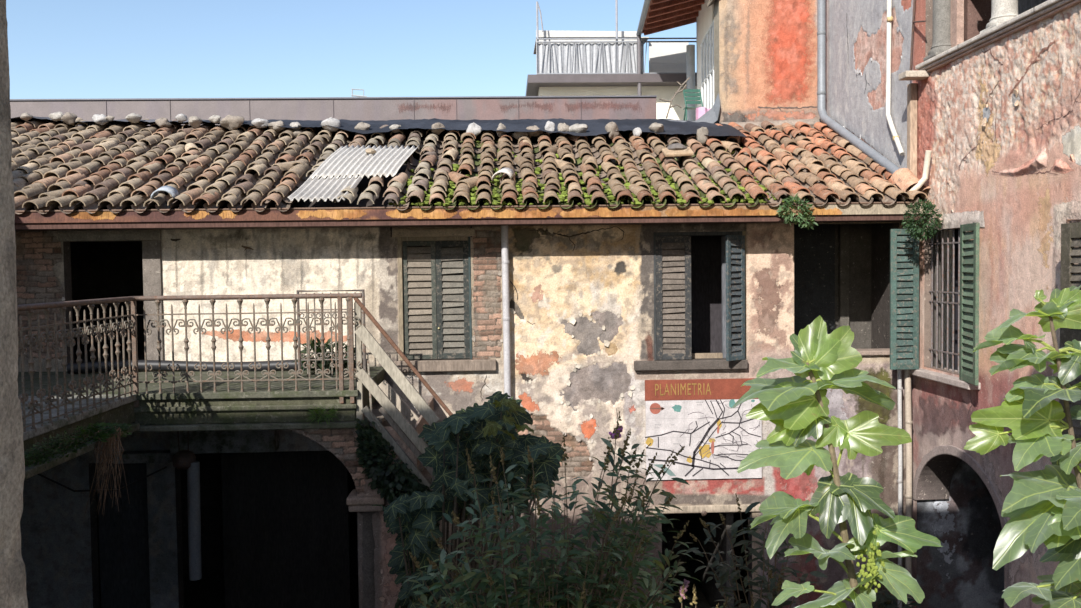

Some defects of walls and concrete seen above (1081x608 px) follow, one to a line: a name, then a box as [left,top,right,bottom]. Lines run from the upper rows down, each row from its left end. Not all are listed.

flaking render [853,0,912,110]
crack [959,41,1057,175]
crack [1036,90,1081,130]
crack [529,226,624,250]
flaking render [472,229,524,360]
peeling [531,284,543,303]
peeling [444,377,474,393]
peeling [515,351,559,413]
flaking render [560,310,636,443]